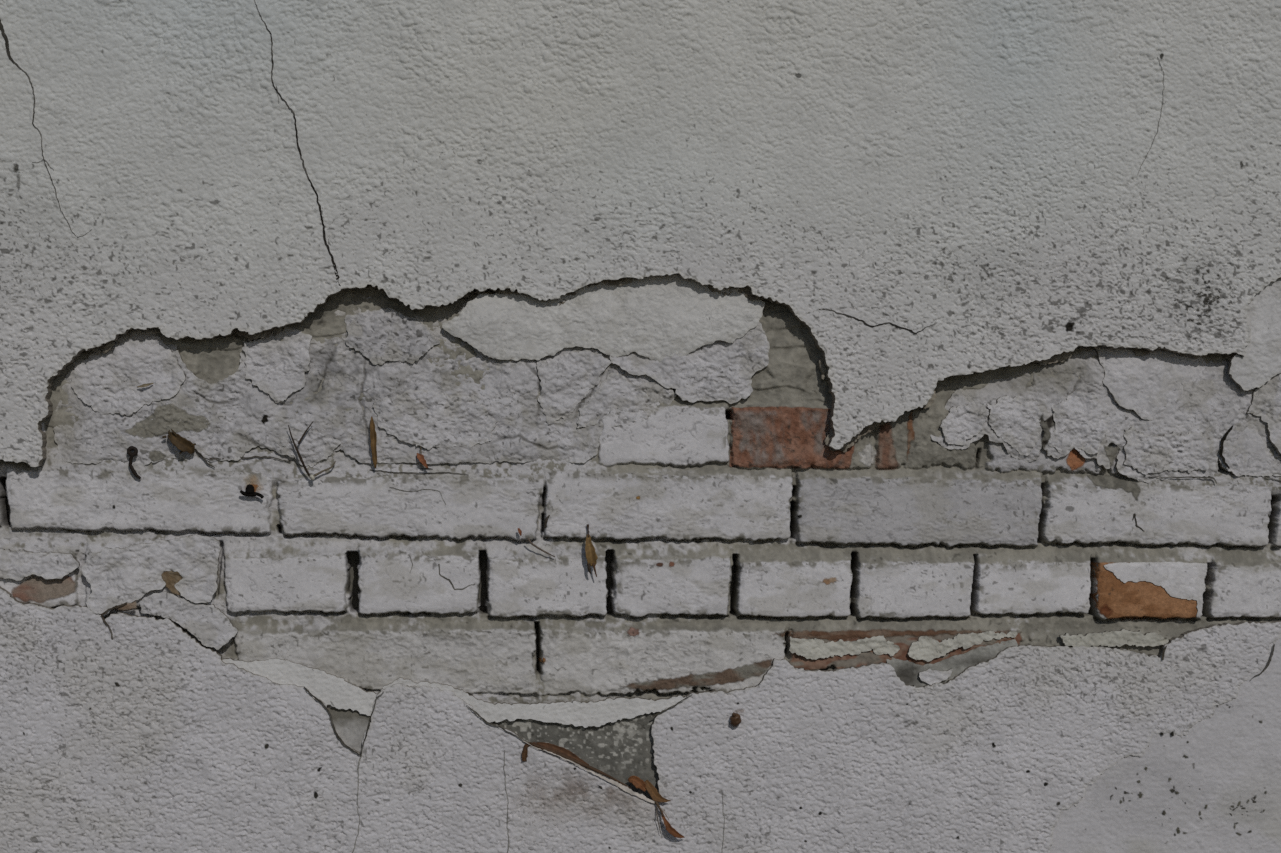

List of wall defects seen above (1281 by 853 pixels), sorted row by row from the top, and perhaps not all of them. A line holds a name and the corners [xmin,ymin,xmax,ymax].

crack [0,19,92,237]
crack [254,0,343,291]
spalling [53,274,1281,501]
peeling [0,534,238,650]
flaking render [1090,562,1207,619]
spalling [327,706,371,754]
peeling [623,659,772,690]
peeling [776,629,1018,687]